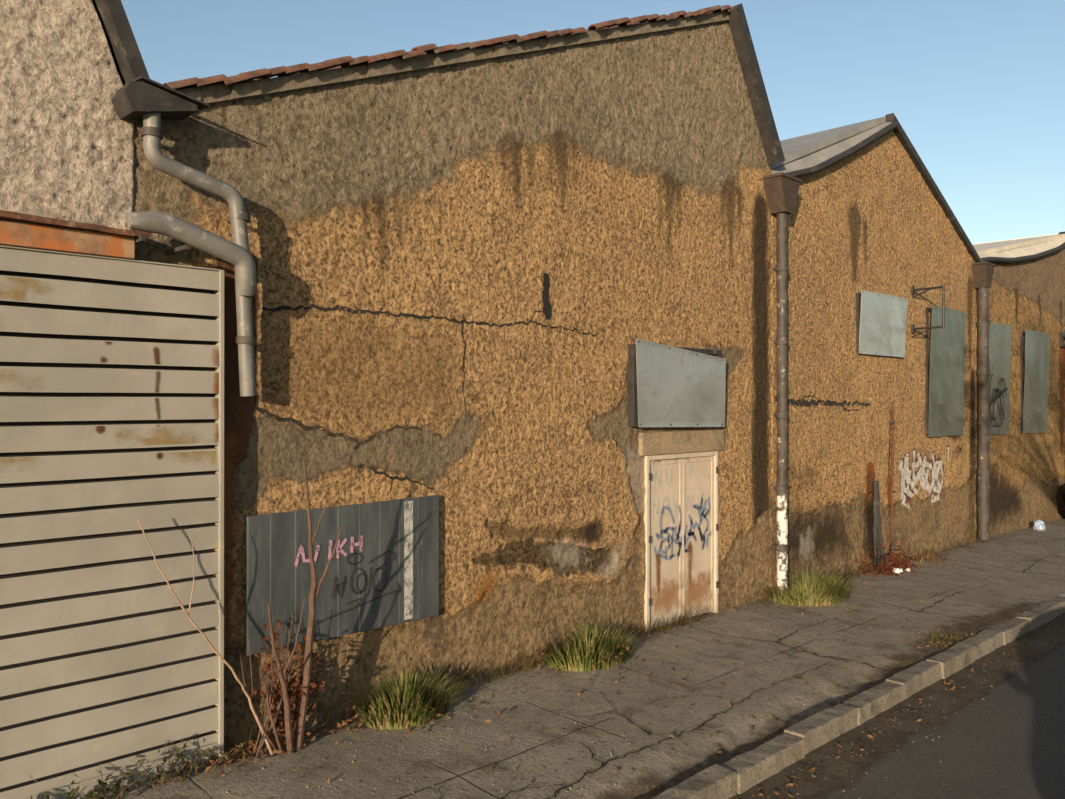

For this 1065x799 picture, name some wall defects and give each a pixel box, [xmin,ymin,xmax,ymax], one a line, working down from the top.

corrosion [249,250,258,363]
crack [262,304,596,413]
corrosion [195,258,255,660]
crack [255,394,441,491]
spalling [224,512,646,748]
corrosion [655,544,710,607]